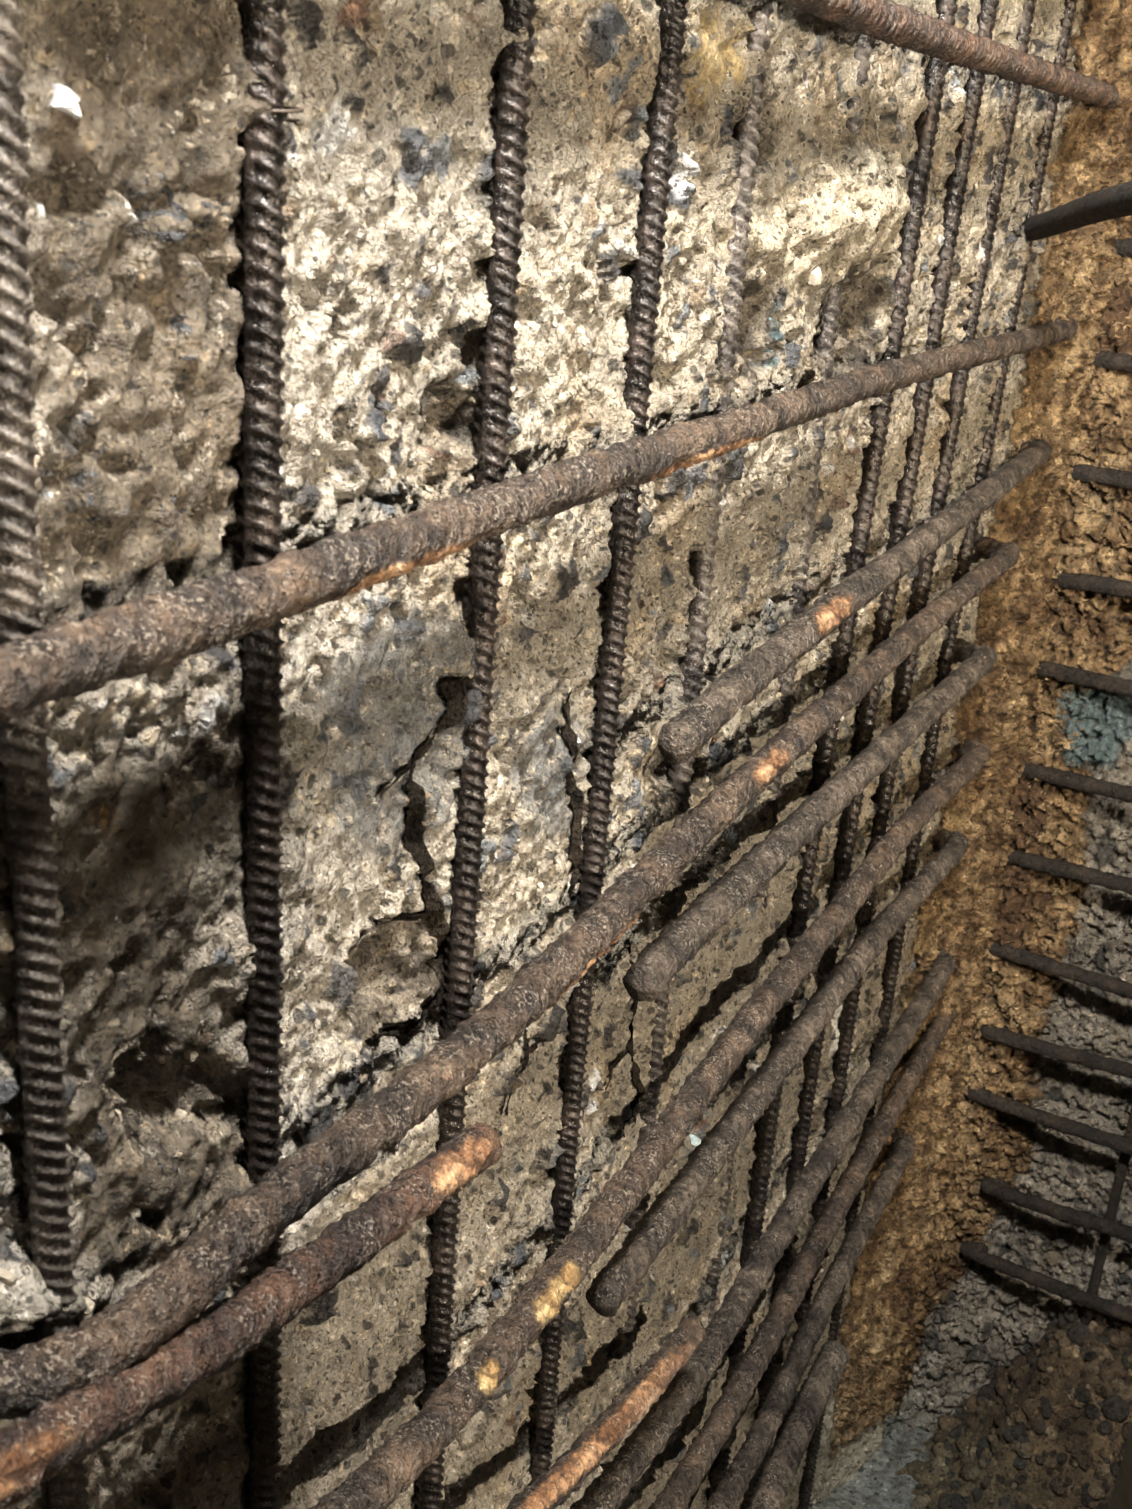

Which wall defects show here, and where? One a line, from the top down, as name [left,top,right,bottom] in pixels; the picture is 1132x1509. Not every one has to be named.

crack [375,678,470,1040]
spalling [0,439,1052,1509]
spalling [0,0,1132,1184]
rust [687,12,756,103]